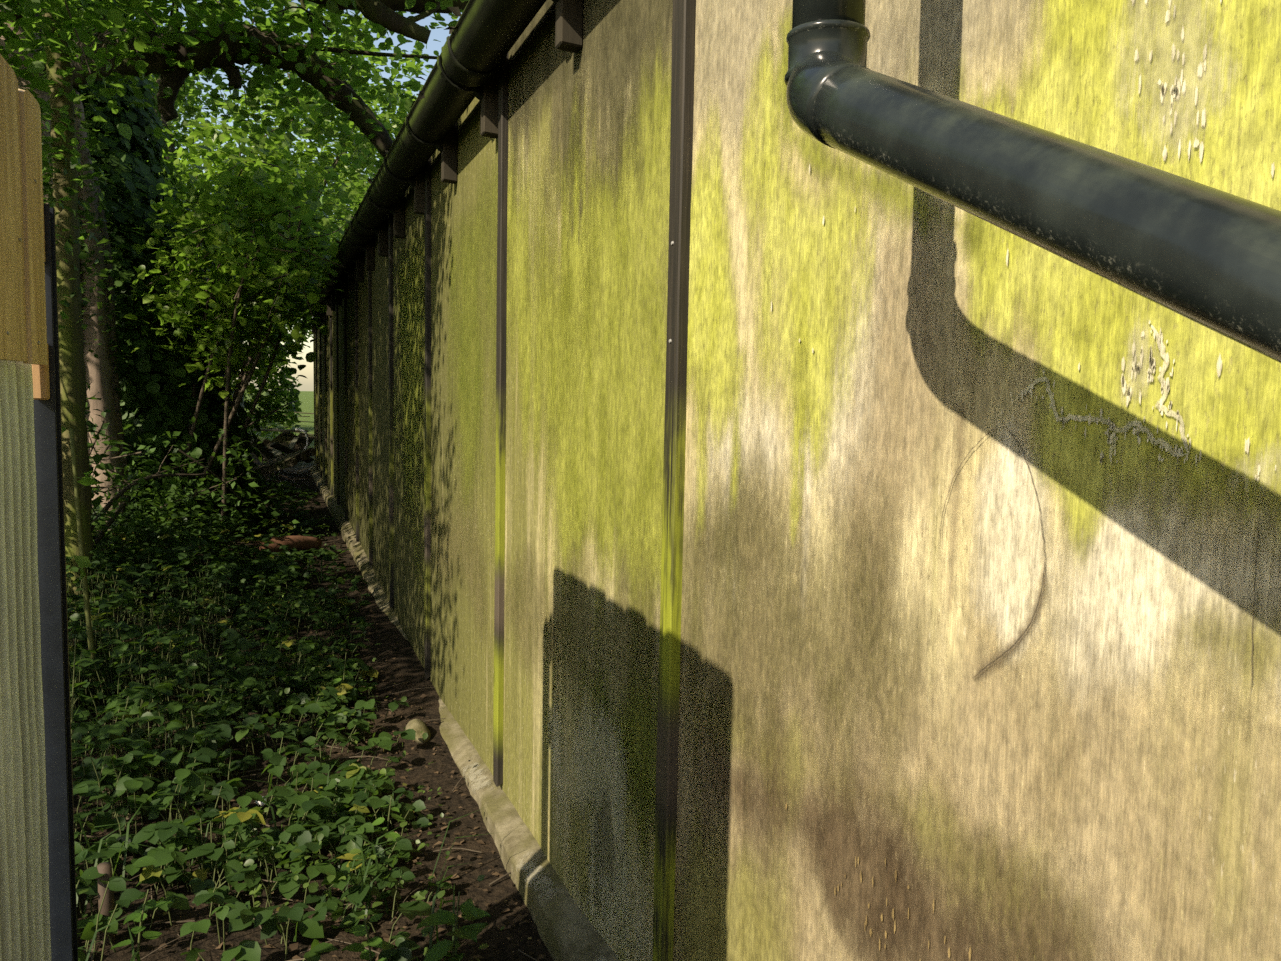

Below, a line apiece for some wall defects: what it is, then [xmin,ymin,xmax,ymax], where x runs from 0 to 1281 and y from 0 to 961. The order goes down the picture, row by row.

water stain [508,0,673,173]
water stain [695,0,793,131]
water stain [865,0,1025,79]
water stain [673,232,1281,961]
crack [940,425,1046,679]